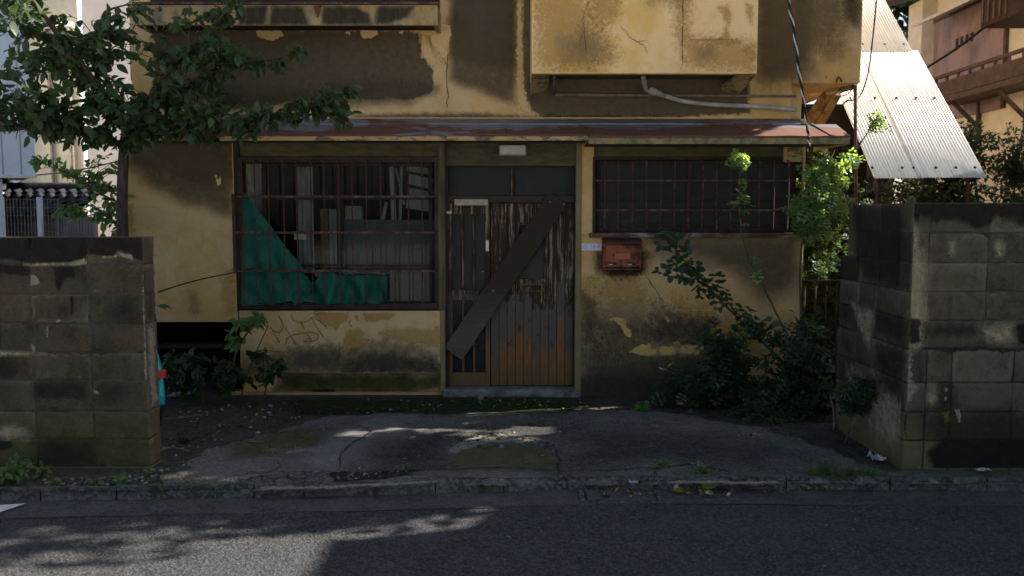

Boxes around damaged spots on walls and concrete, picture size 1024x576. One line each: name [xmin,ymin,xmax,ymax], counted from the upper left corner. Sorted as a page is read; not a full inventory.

peeling [345,30,378,39]
damp [152,0,750,117]
peeling [314,311,441,348]
peeling [609,317,745,356]
damp [243,345,441,372]
damp [924,384,1024,468]
crack [222,424,372,483]